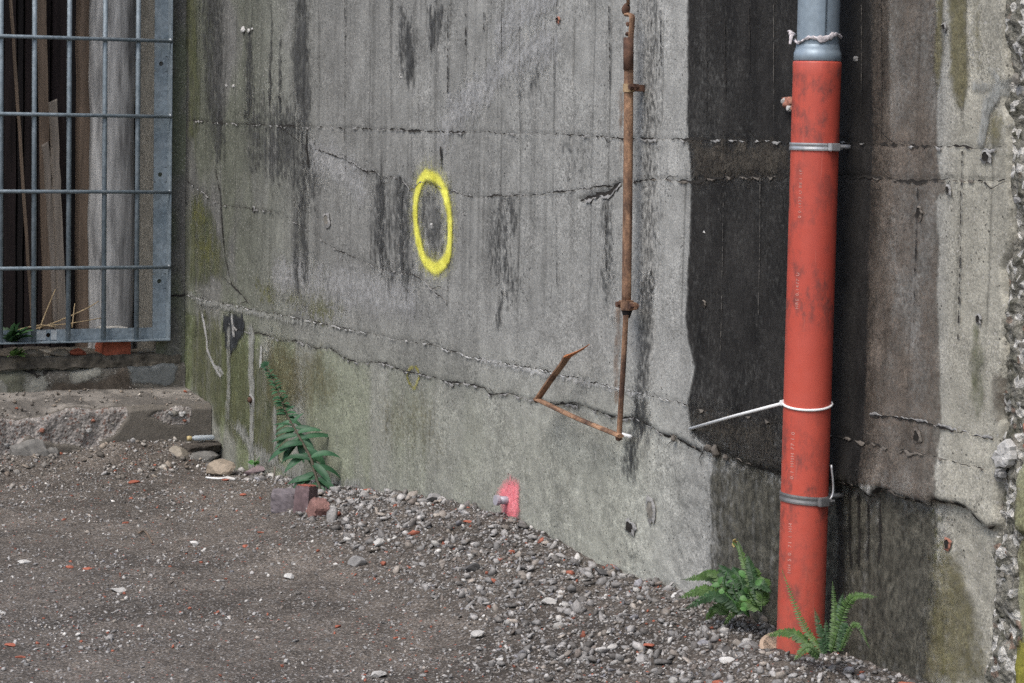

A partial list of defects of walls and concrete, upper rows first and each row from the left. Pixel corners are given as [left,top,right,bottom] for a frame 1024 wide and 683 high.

damp [396,4,447,87]
damp [188,292,314,479]
damp [370,168,447,296]
crack [171,170,783,473]
damp [685,0,798,628]
damp [824,0,944,682]
crack [829,480,995,530]